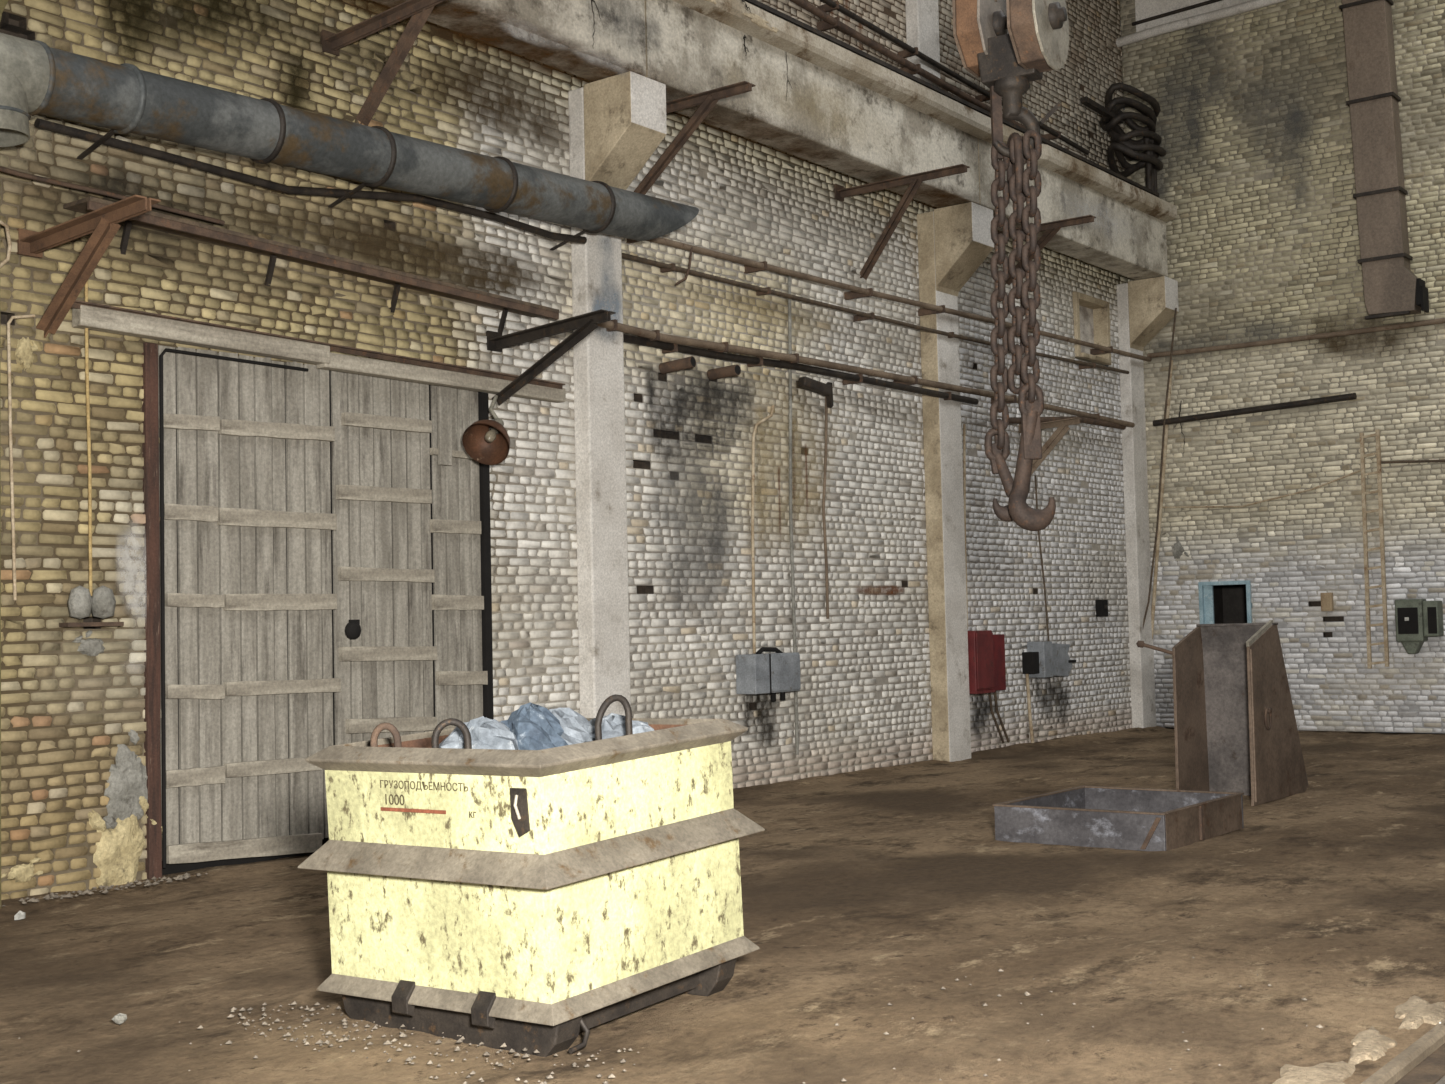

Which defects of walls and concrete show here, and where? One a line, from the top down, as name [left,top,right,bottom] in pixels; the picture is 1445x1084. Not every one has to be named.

spalling [88,729,162,887]